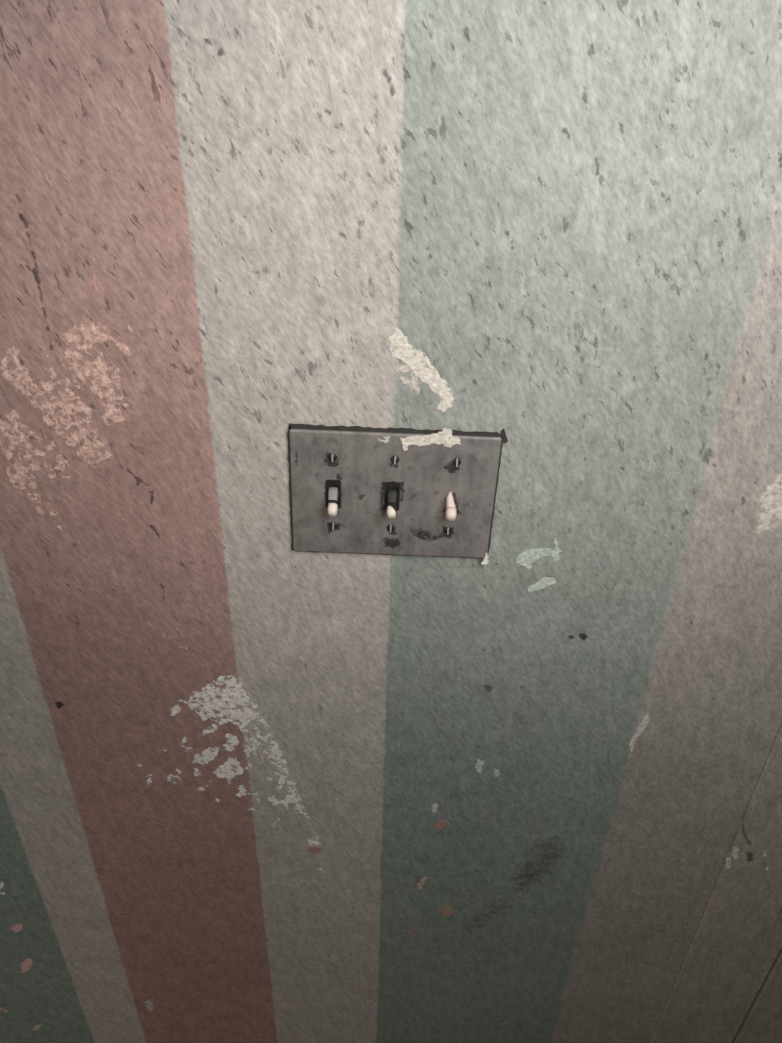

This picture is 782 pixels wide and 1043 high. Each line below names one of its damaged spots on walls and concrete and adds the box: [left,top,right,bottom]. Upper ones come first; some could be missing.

peeling [389,327,454,412]
peeling [0,320,133,531]
peeling [516,538,563,570]
peeling [527,577,556,593]
peeling [167,675,310,827]